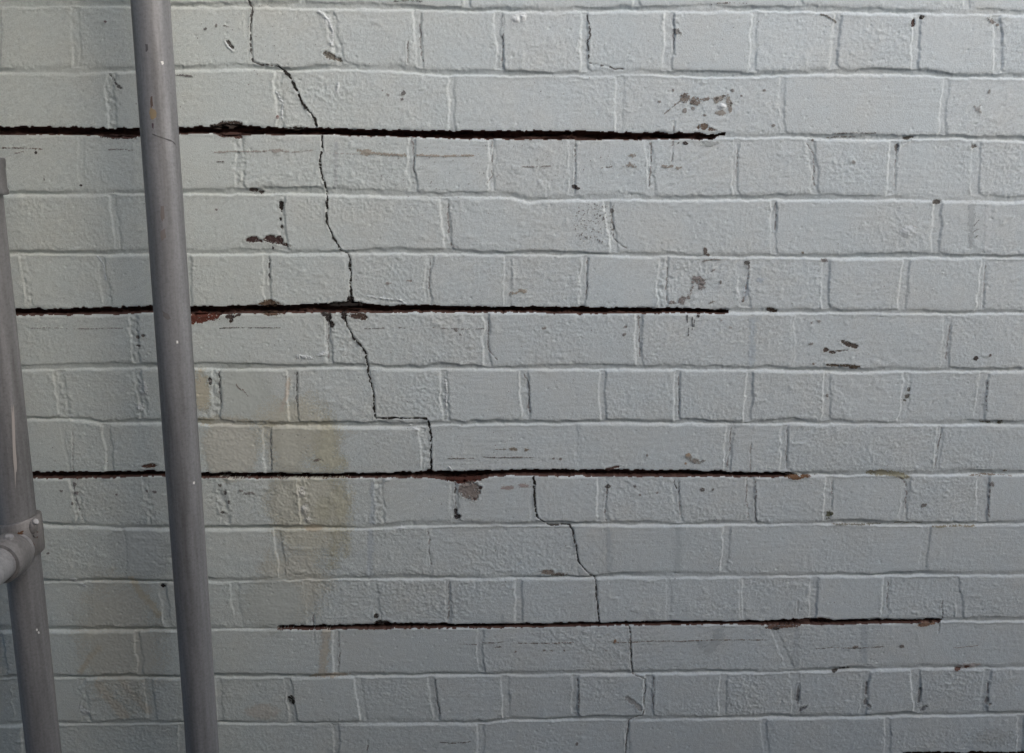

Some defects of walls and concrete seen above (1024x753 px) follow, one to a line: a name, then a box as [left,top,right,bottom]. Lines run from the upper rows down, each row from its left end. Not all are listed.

crack [587,14,624,70]
peeling [658,89,743,131]
spalling [246,201,291,249]
crack [248,0,433,470]
crack [523,374,531,413]
spalling [446,474,482,519]
crack [726,427,757,522]
crack [532,476,600,622]
crack [625,621,655,753]